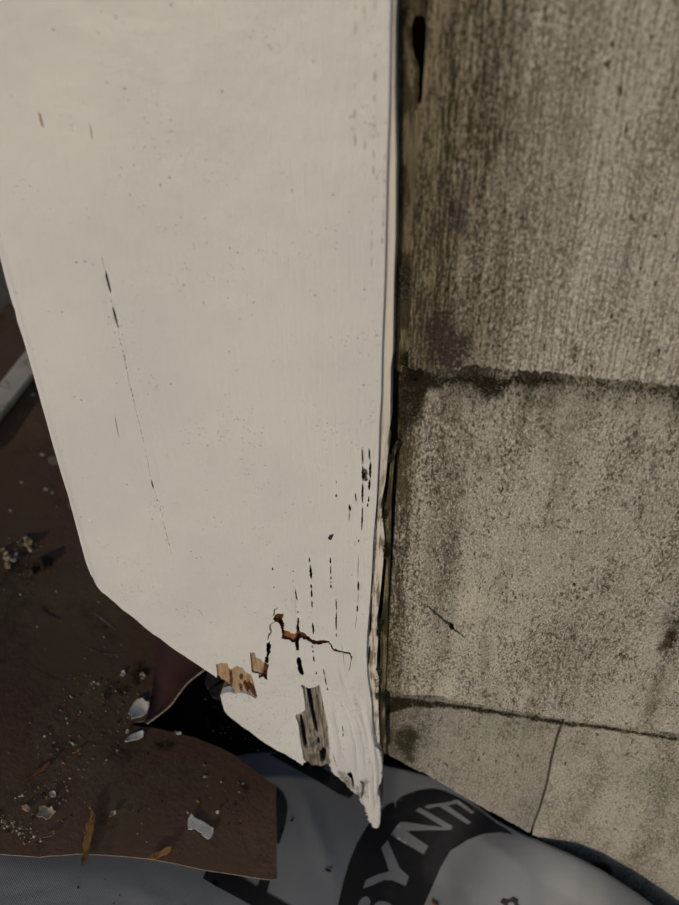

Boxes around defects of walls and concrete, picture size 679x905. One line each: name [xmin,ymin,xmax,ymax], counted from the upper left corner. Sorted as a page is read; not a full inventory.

crack [268,449,380,690]